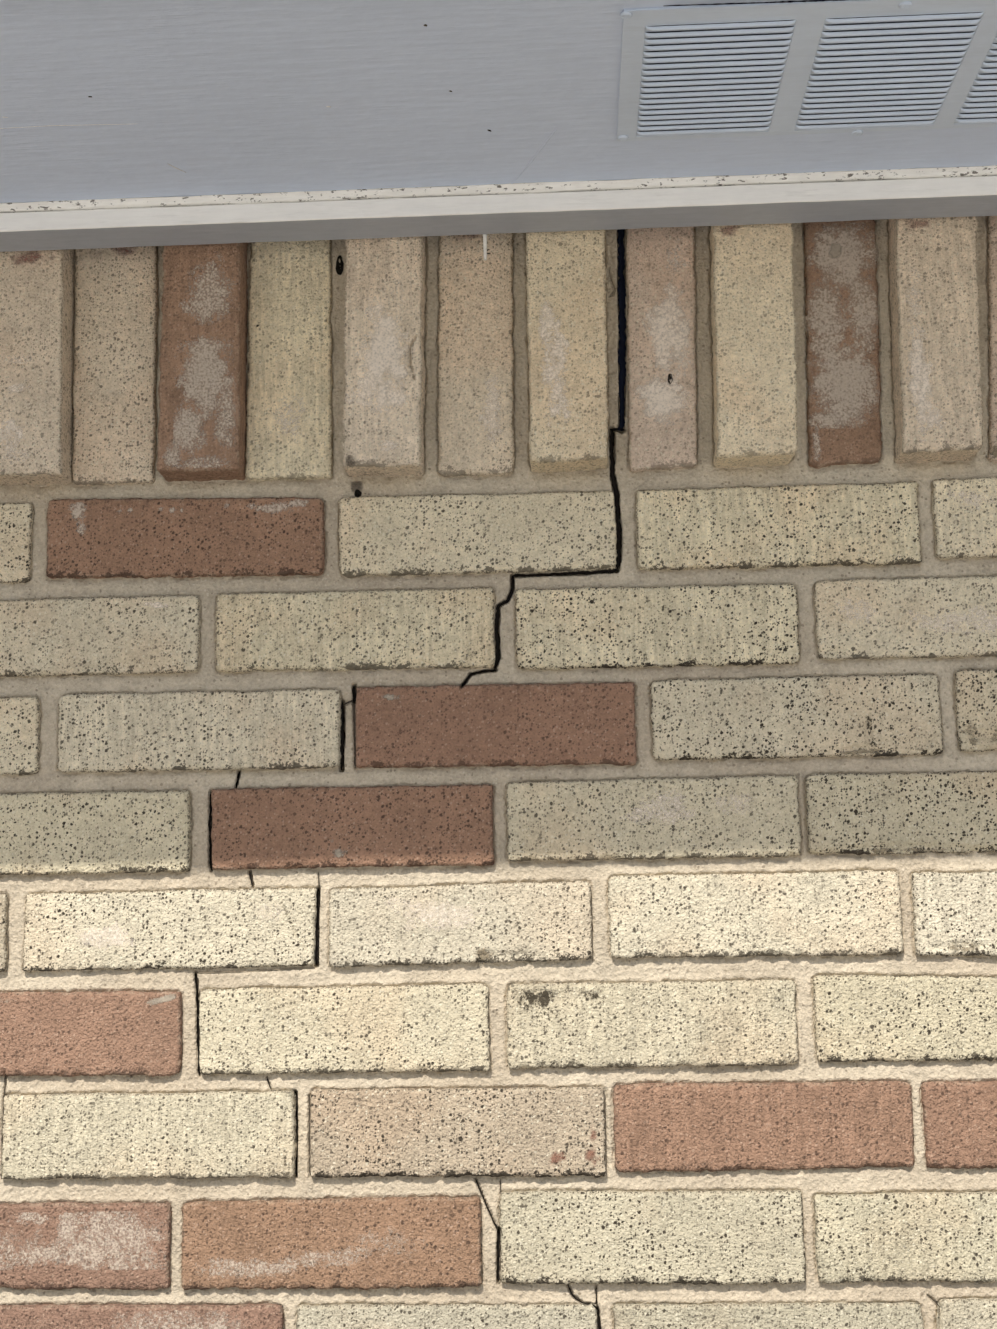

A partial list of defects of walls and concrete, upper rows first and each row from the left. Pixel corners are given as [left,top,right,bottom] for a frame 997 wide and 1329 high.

crack [461,229,626,687]
crack [340,686,356,770]
crack [208,771,240,870]
crack [195,873,320,1075]
crack [267,1078,311,1176]
efflorescence [0,1211,164,1270]
efflorescence [124,1310,239,1329]
efflorescence [202,1239,366,1277]
crack [475,1178,501,1282]
crack [568,1285,601,1329]